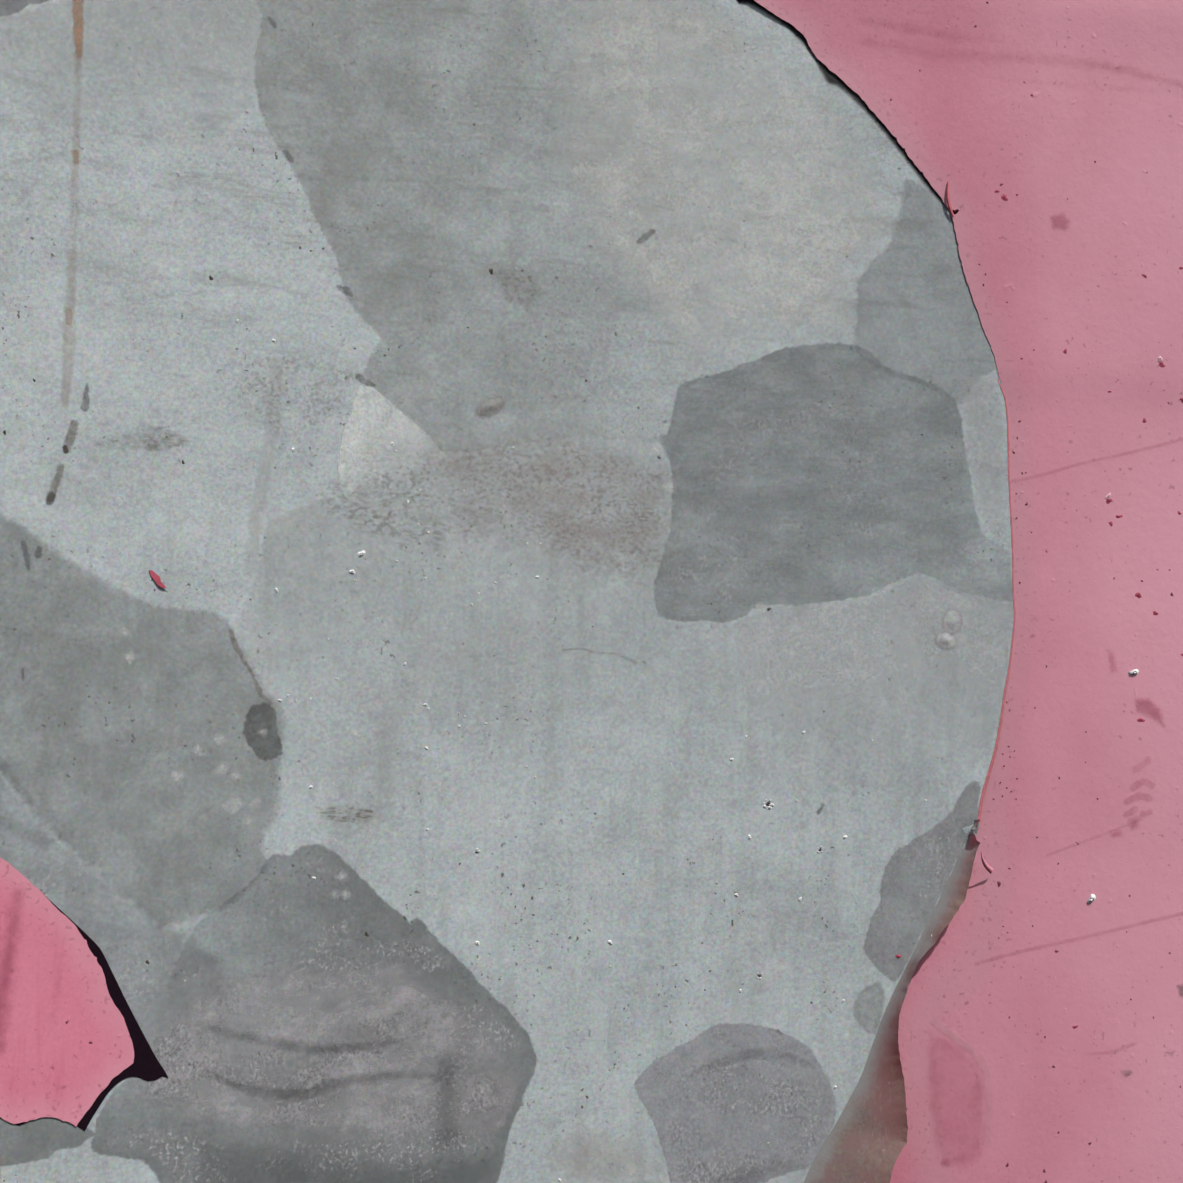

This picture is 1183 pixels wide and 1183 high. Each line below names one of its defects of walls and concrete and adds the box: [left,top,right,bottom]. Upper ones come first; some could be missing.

corrosion [73,0,83,56]
damp [762,349,811,374]
damp [244,703,282,760]
damp [864,782,980,979]
peeling [0,858,134,1126]
damp [0,861,536,1183]
damp [635,1024,835,1183]